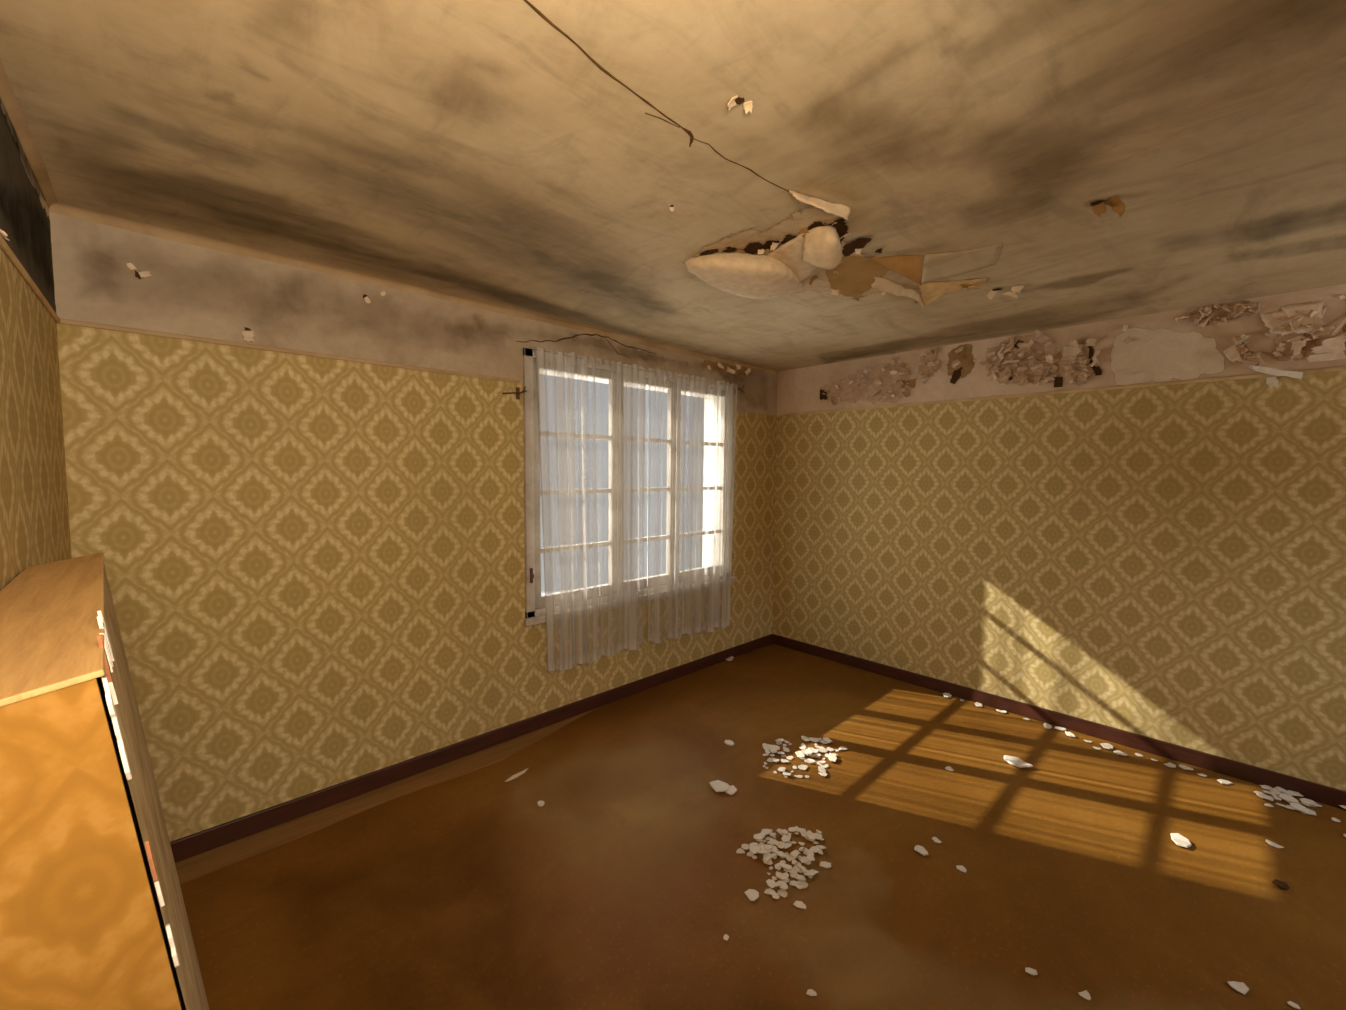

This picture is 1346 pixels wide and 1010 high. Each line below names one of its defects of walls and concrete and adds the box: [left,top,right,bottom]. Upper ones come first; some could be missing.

crack [524,0,789,192]
flaking render [0,101,56,313]
peeling [683,190,1025,308]
peeling [1090,196,1125,217]
flaking render [820,294,1346,405]